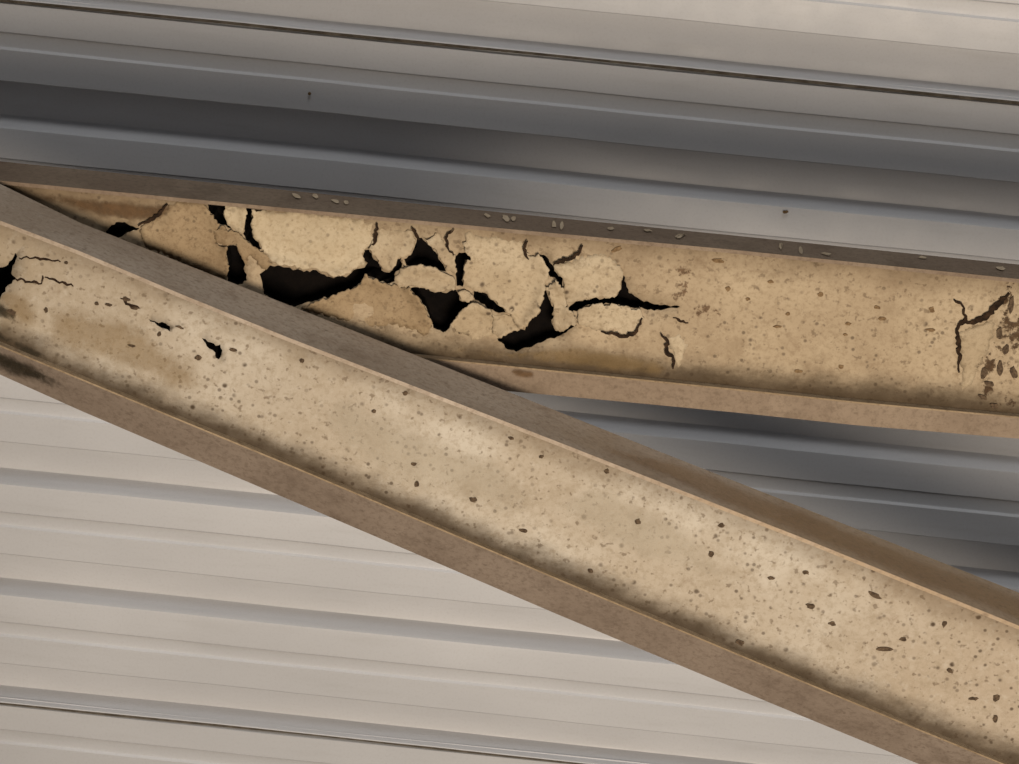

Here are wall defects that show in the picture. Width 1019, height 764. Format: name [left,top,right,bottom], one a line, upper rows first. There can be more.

crack [15,256,73,286]
peeling [140,202,644,340]
peeling [668,334,688,367]
crack [954,292,1010,373]